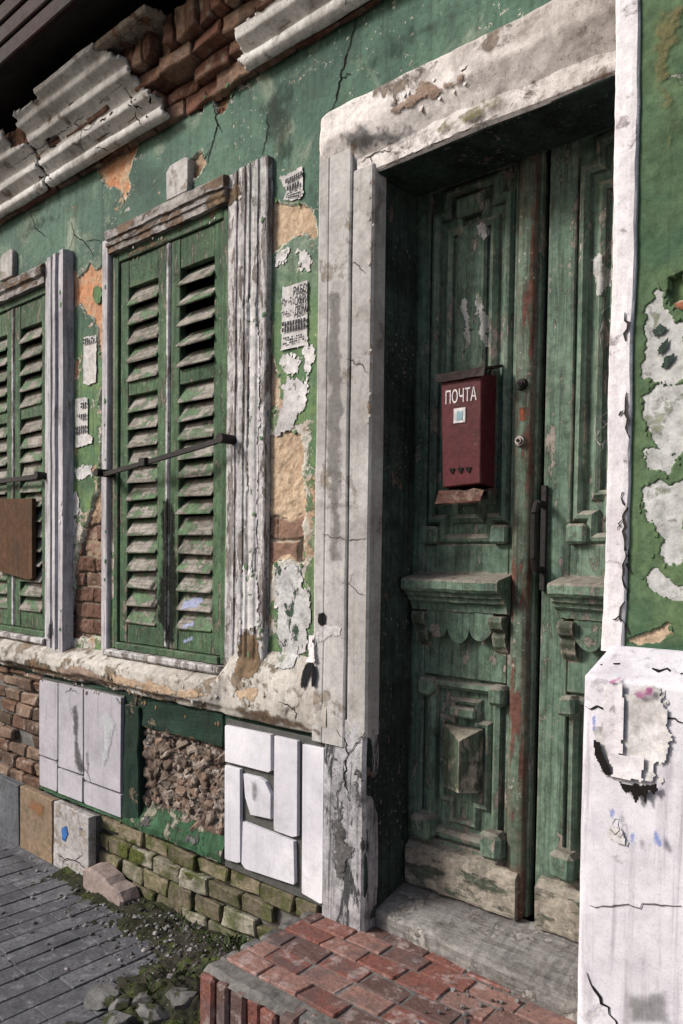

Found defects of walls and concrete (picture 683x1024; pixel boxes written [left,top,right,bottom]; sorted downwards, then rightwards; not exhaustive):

crack [330,0,356,111]
crack [9,84,152,255]
crack [202,91,222,171]
flaking render [261,197,317,272]
peeling [74,264,106,355]
peeling [637,286,683,601]
flaking render [231,297,341,706]
flaking render [47,458,106,641]
crack [336,731,365,818]
spalling [593,740,658,804]
crack [590,902,671,910]
crack [587,974,617,1024]